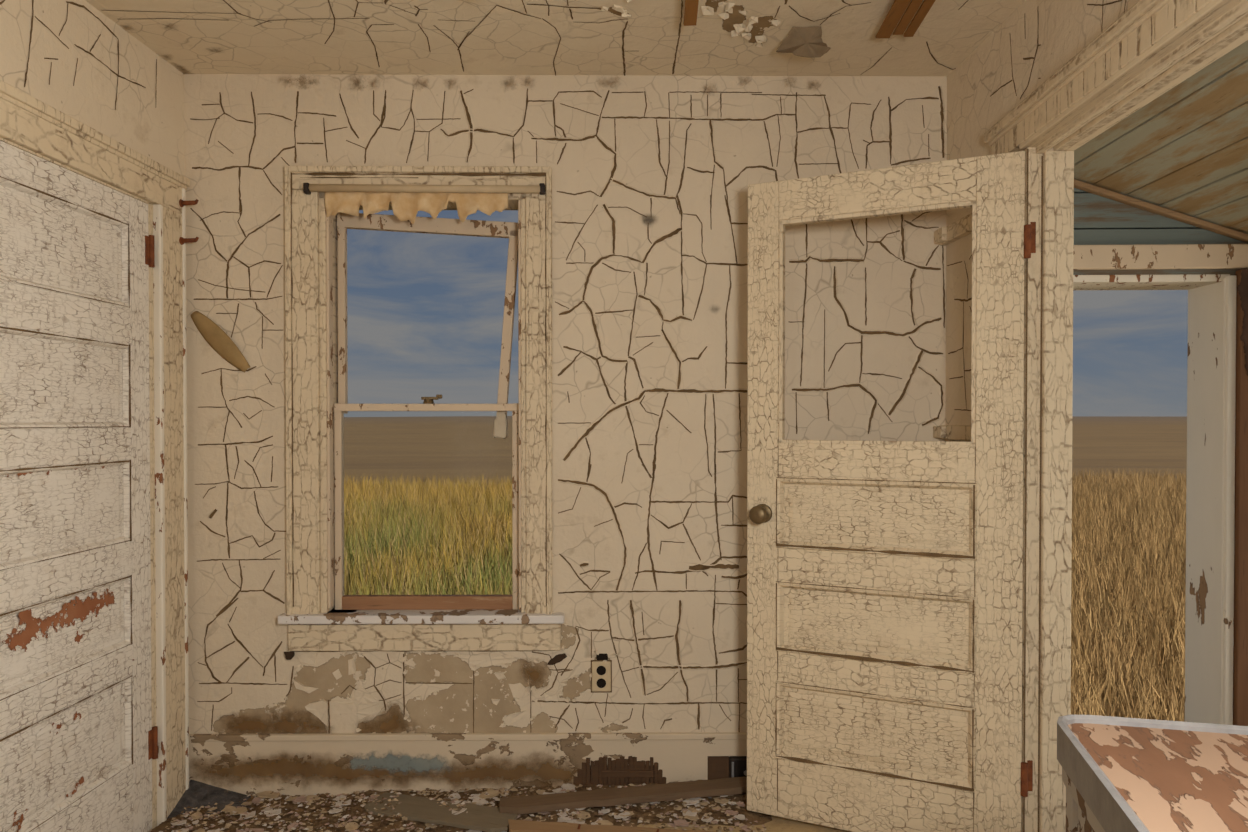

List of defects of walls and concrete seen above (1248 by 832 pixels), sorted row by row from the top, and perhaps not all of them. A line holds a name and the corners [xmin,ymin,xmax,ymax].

crack [0,0,297,110]
peeling [598,0,632,18]
peeling [701,0,780,47]
crack [990,10,1041,99]
crack [190,0,972,733]
peeling [2,589,116,656]
peeling [213,622,617,734]
peeling [599,723,628,733]